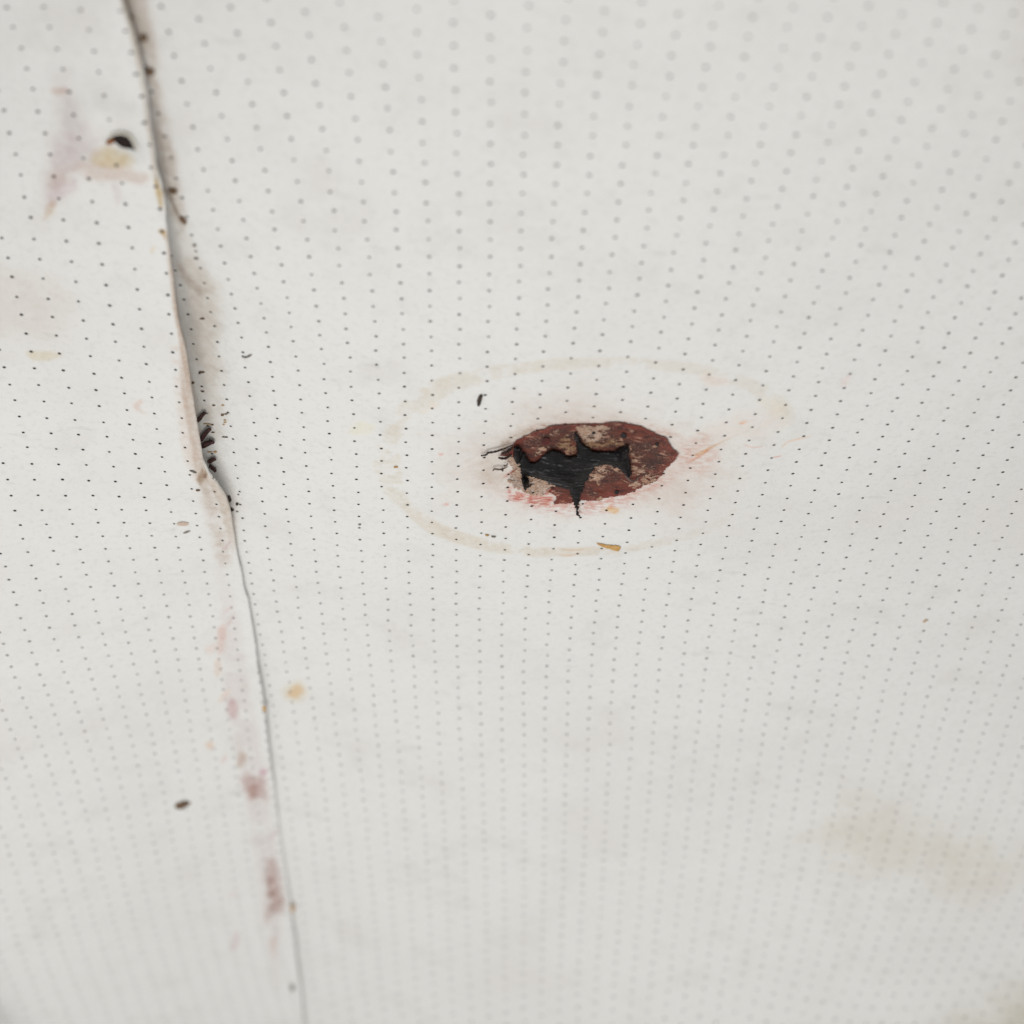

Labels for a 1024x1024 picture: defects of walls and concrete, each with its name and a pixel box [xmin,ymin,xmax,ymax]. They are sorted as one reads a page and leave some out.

peeling [507,457,555,496]
peeling [536,425,660,494]